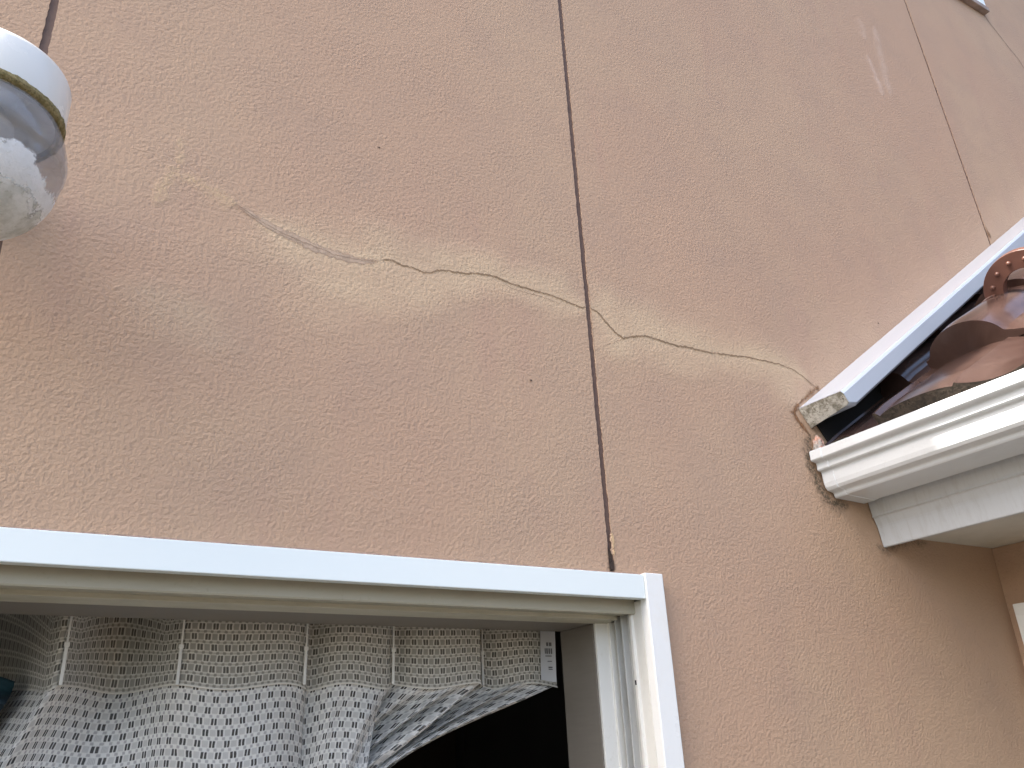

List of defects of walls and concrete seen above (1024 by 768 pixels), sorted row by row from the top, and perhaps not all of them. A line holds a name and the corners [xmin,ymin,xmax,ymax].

crack [242,208,815,387]